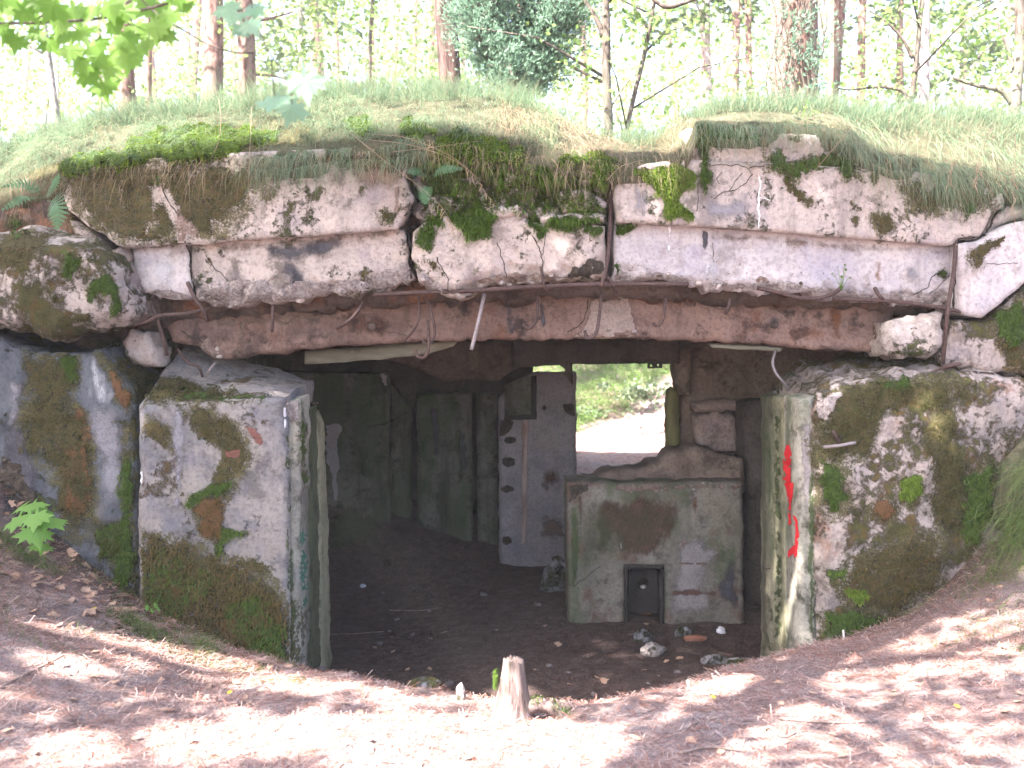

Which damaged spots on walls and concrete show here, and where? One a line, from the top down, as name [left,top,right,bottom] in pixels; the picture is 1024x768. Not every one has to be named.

crack [161,185,229,295]
crack [396,199,449,292]
spalling [126,190,962,378]
crack [696,164,773,228]